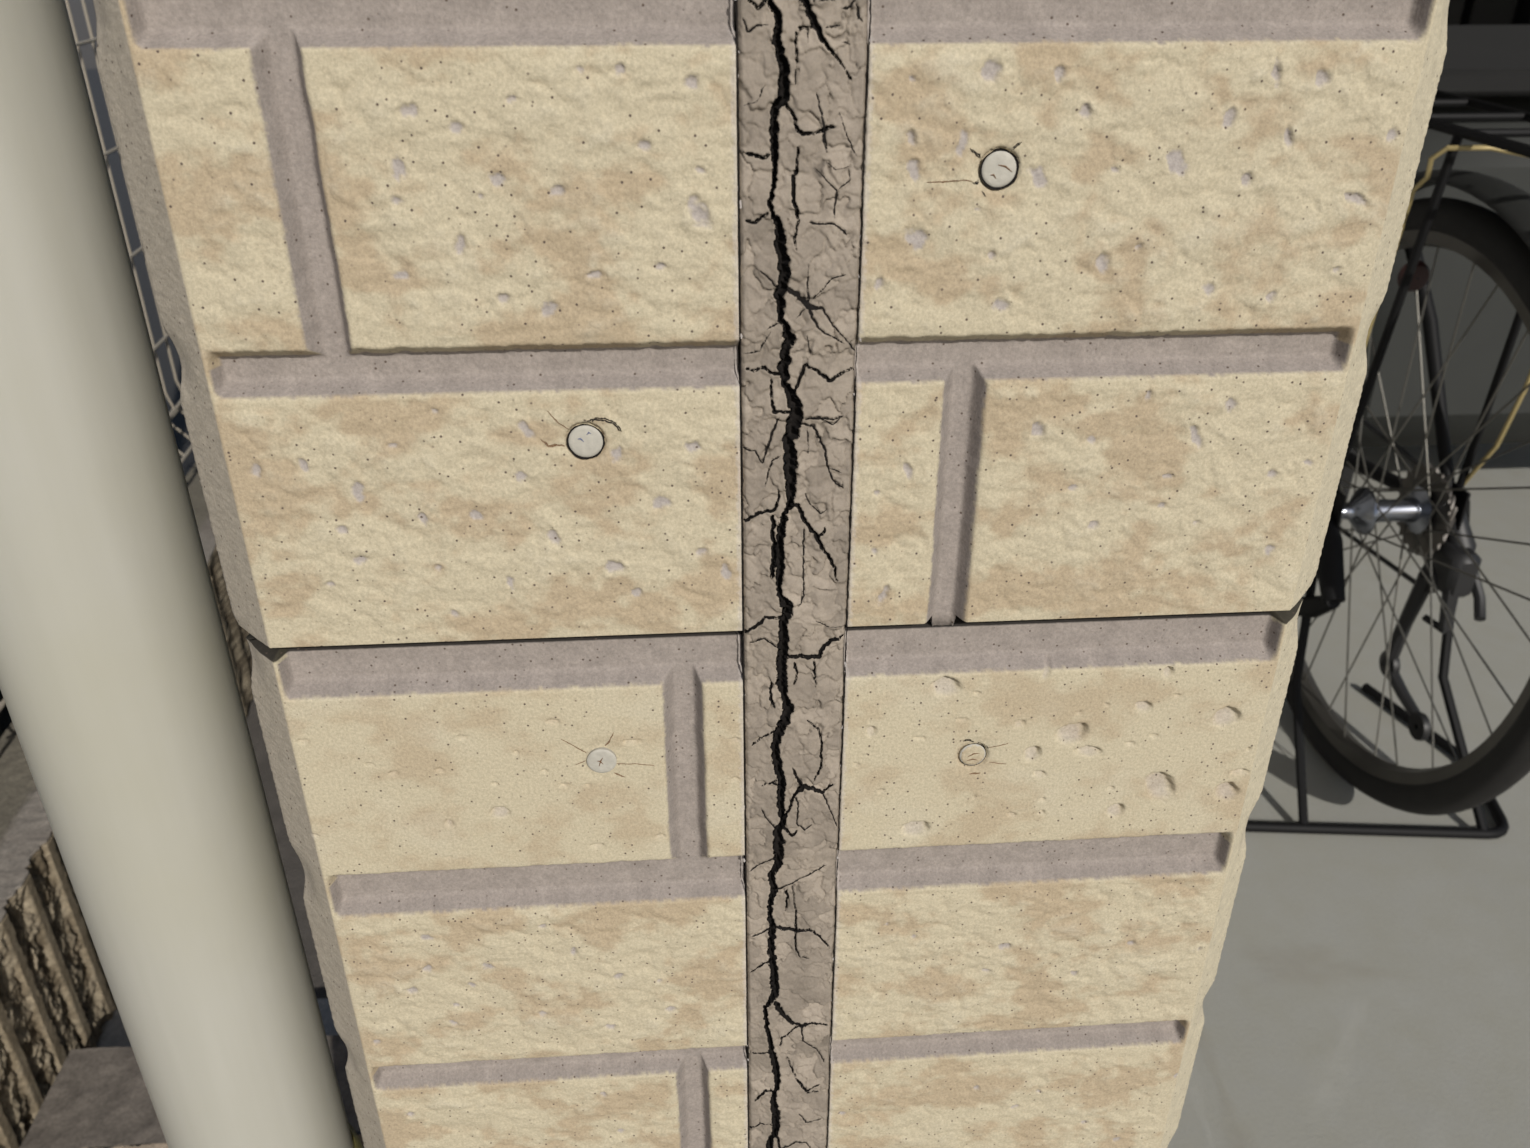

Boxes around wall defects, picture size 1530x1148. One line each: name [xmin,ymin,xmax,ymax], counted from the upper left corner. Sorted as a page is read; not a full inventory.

crack [735,0,872,1148]